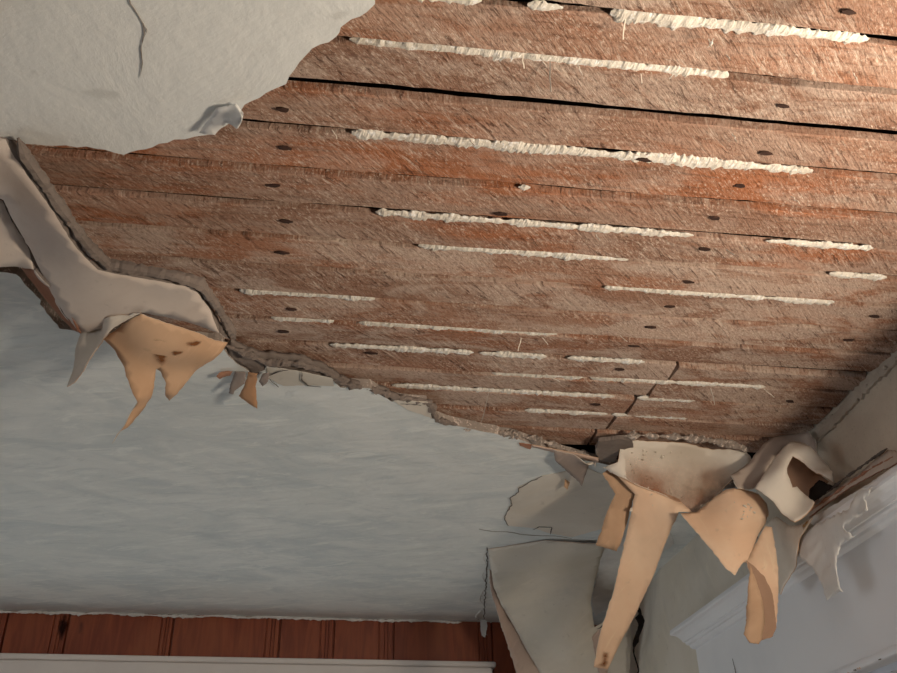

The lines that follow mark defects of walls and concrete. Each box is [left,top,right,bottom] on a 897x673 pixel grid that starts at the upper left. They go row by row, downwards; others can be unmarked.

crack [129,0,147,76]
peeling [199,103,243,135]
spalling [17,137,472,431]
spalling [811,351,897,444]
spalling [484,429,748,462]
peeling [475,552,487,637]
crack [633,608,645,673]